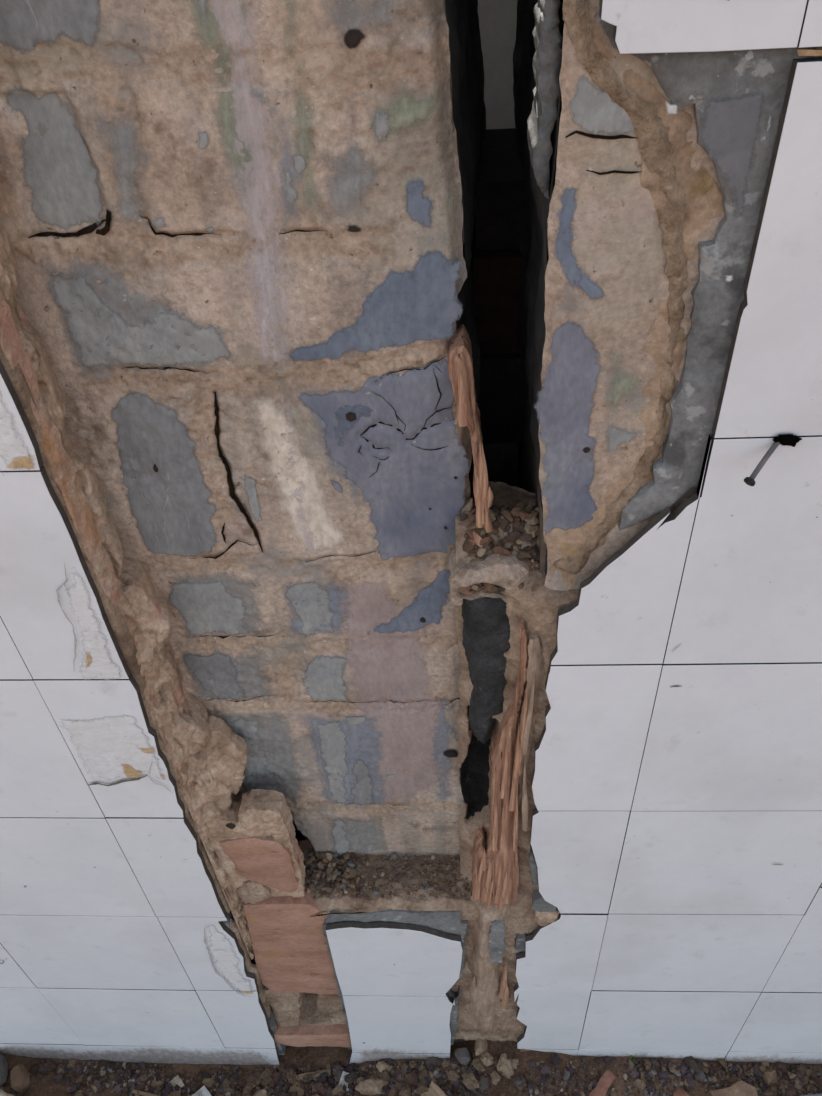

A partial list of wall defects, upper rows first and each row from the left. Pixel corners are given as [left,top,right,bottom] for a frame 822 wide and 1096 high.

spalling [344,29,365,49]
crack [565,130,637,140]
crack [586,168,642,176]
crack [28,209,111,238]
crack [139,215,220,237]
crack [358,356,454,478]
crack [121,366,263,559]
spalling [56,563,120,679]
spalling [62,715,171,792]
spalling [443,723,491,819]
peeling [529,845,556,912]
spalling [204,925,347,1027]